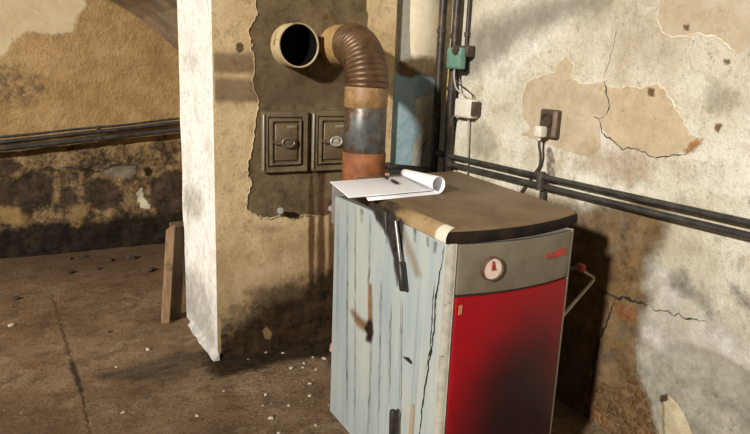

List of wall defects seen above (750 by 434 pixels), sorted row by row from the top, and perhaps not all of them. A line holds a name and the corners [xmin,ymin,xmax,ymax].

flaking render [236,0,368,220]
peeling [389,74,435,175]
flaking render [522,55,697,157]
crack [593,33,689,158]
flaking render [0,159,182,227]
water stain [0,191,198,259]
rust [308,173,334,283]
crack [50,294,91,434]
water stain [188,267,337,376]
water stain [545,200,740,434]
crack [590,287,707,393]
flaking render [582,344,750,434]